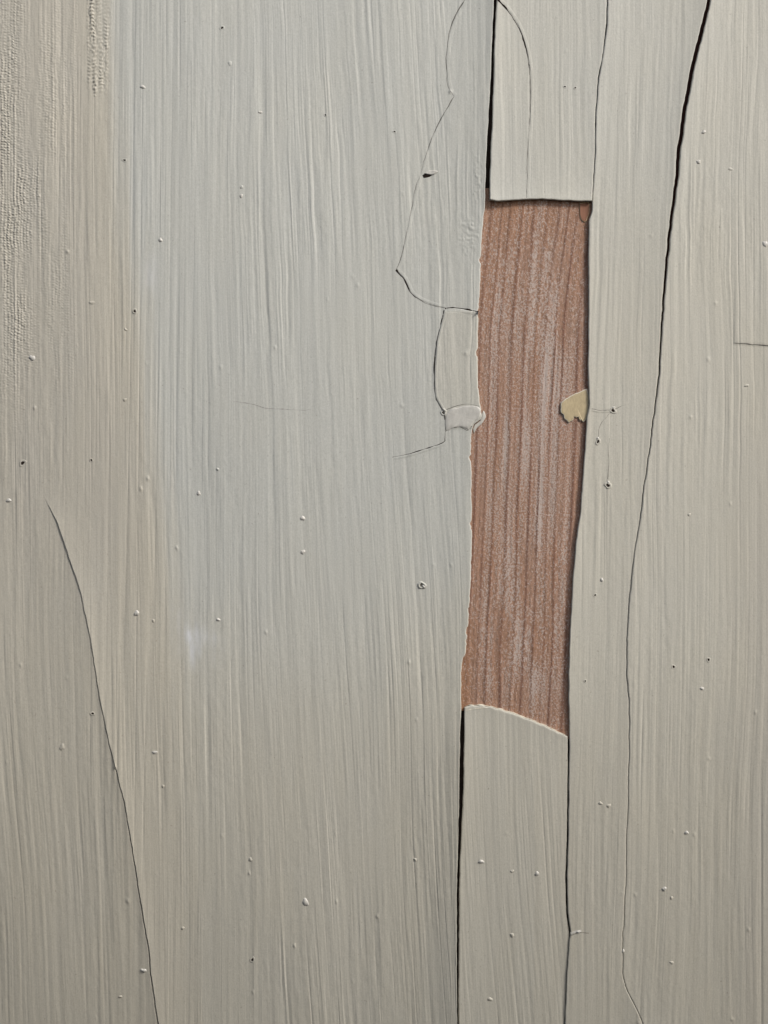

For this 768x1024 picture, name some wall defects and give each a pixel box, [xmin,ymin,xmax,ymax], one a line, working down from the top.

crack [392,0,481,460]
crack [485,0,534,200]
peeling [461,188,593,739]
crack [595,7,607,127]
crack [626,0,710,686]
crack [456,711,464,1024]
crack [564,739,584,1024]